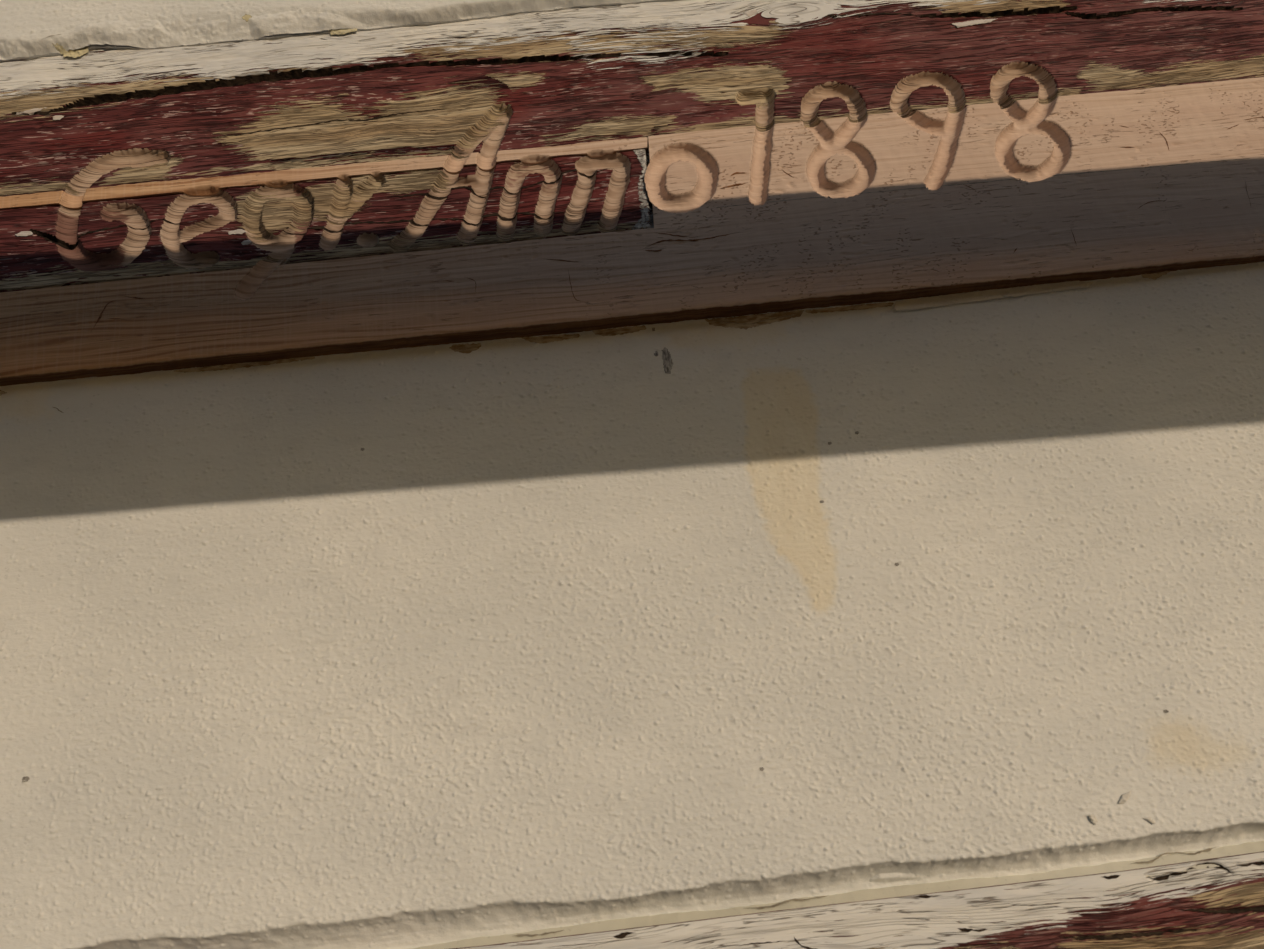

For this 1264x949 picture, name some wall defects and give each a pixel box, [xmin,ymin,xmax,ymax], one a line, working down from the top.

peeling [918,0,1072,28]
crack [11,51,728,115]
peeling [0,9,1264,291]
water stain [655,312,844,621]
peeling [1051,876,1264,949]